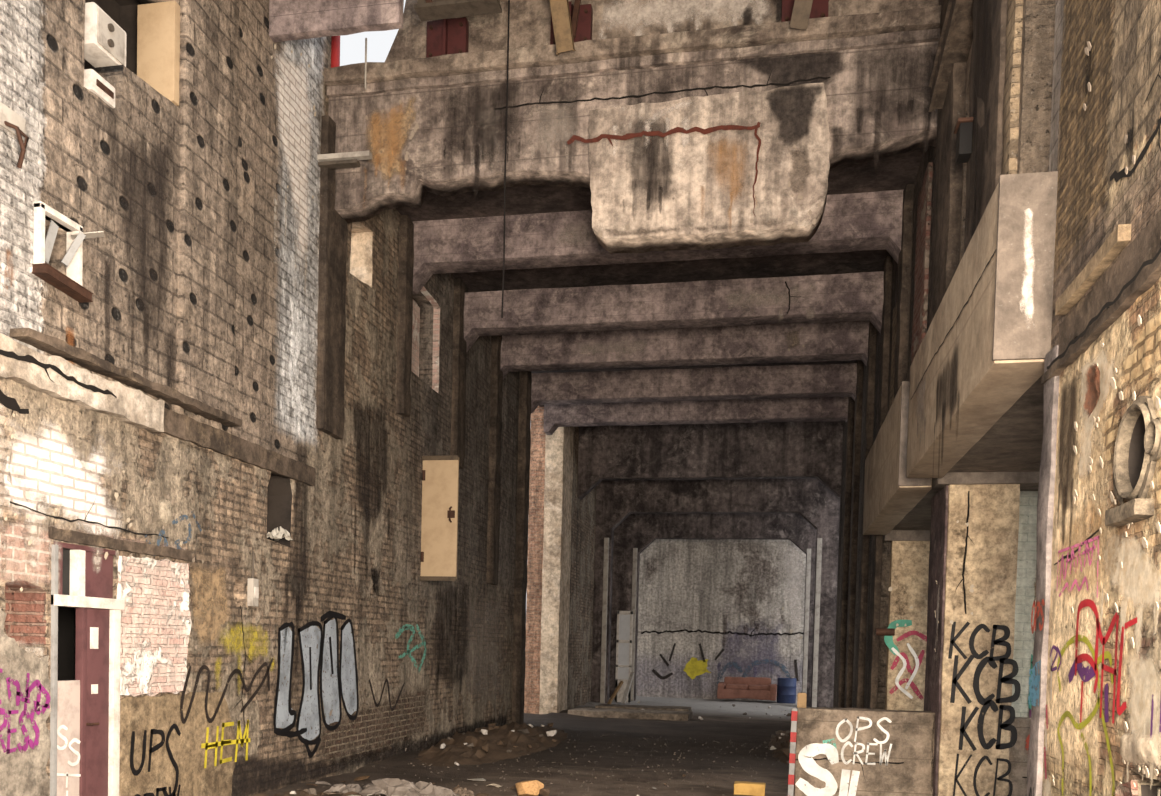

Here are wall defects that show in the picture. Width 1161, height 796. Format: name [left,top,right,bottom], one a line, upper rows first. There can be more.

water stain [633,103,688,209]
water stain [736,51,842,144]
crack [1110,54,1161,182]
crack [0,390,29,415]
crack [0,349,117,398]
water stain [923,350,959,471]
water stain [1057,383,1077,563]
peeling [0,429,236,796]